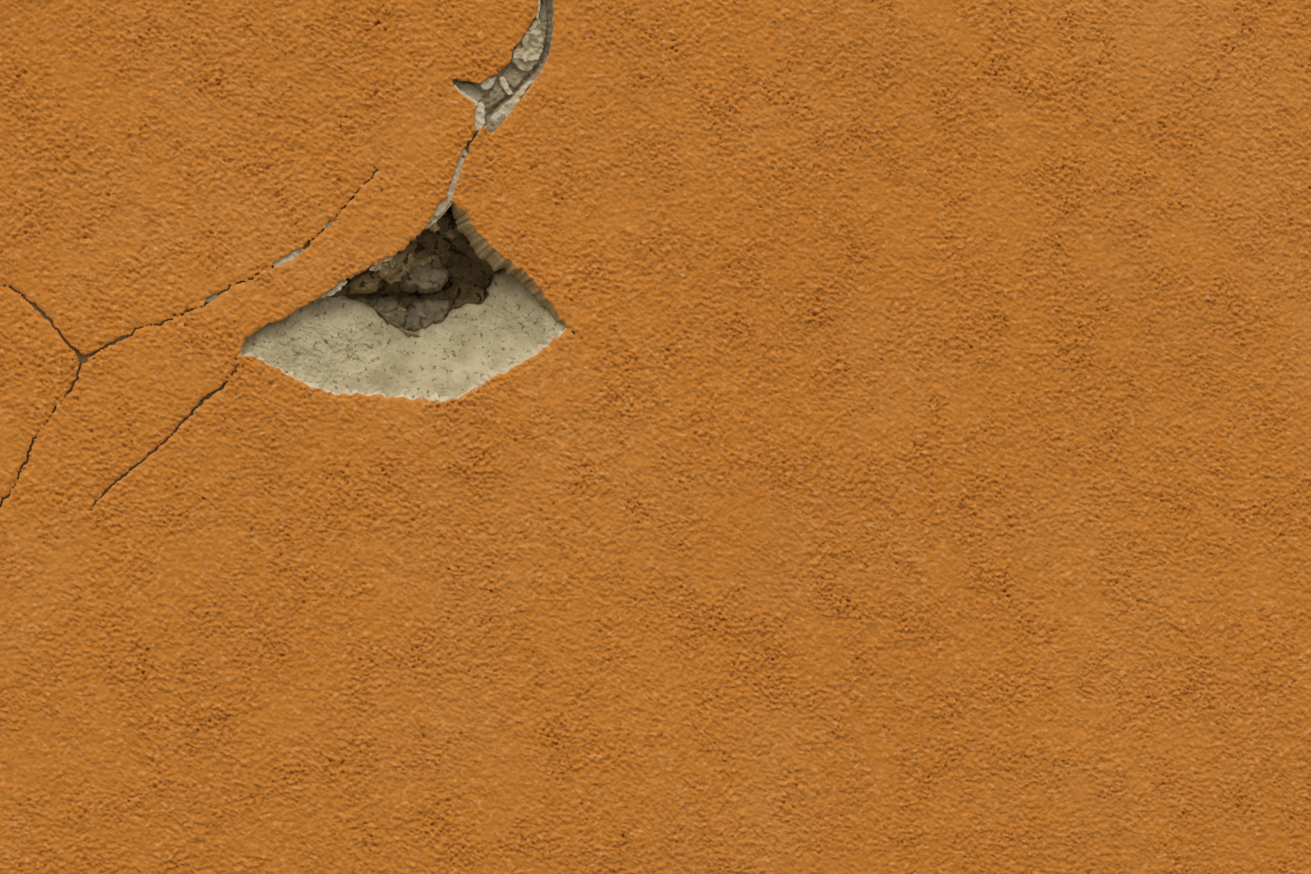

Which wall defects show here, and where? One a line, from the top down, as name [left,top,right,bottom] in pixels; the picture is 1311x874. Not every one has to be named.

crack [446,0,553,202]
crack [0,167,378,510]
flaking render [240,198,568,402]